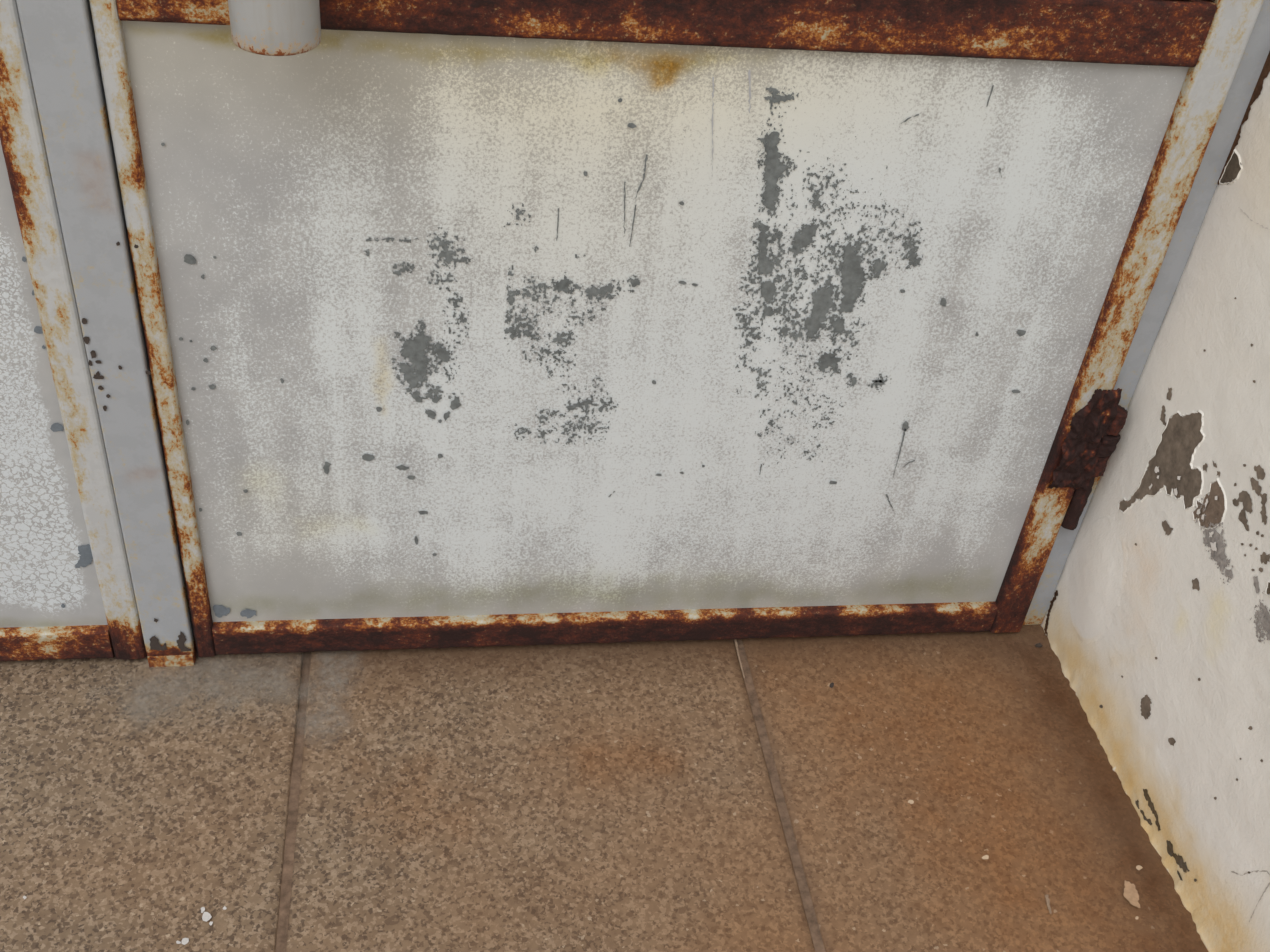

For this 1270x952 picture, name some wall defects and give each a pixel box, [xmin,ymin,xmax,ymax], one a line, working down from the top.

peeling [184,254,205,279]
peeling [351,224,473,423]
peeling [504,203,531,227]
peeling [504,265,640,446]
peeling [732,86,926,470]
peeling [1118,388,1270,642]